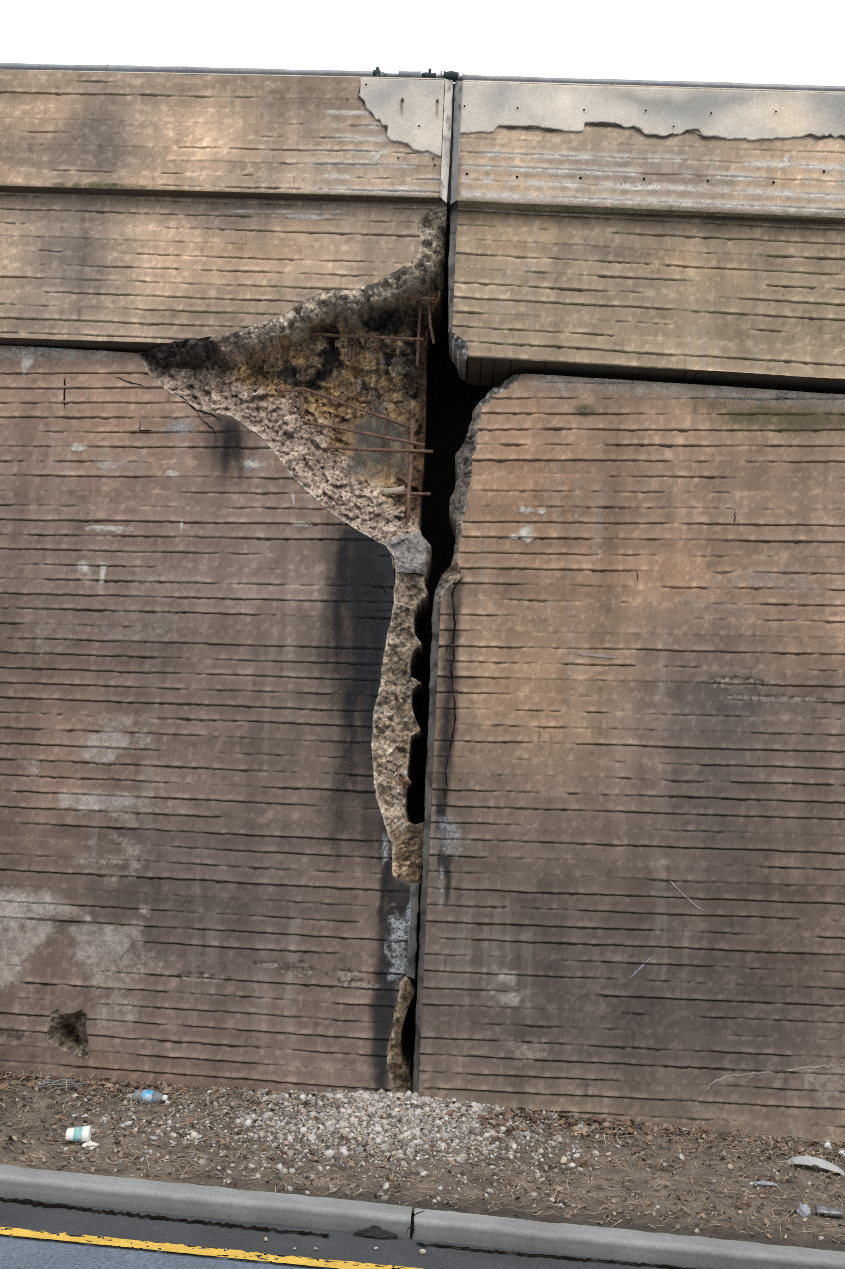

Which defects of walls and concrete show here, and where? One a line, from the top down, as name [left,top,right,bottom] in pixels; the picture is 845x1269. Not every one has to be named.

flaking render [358,78,445,157]
flaking render [460,82,845,141]
water stain [213,419,259,470]
spalling [138,207,523,884]
crack [371,550,396,612]
water stain [327,527,395,793]
crack [444,577,464,802]
peeling [58,792,143,819]
peeling [0,892,72,986]
spalling [45,916,162,1058]
spalling [326,968,371,988]
crack [406,1209,696,1269]